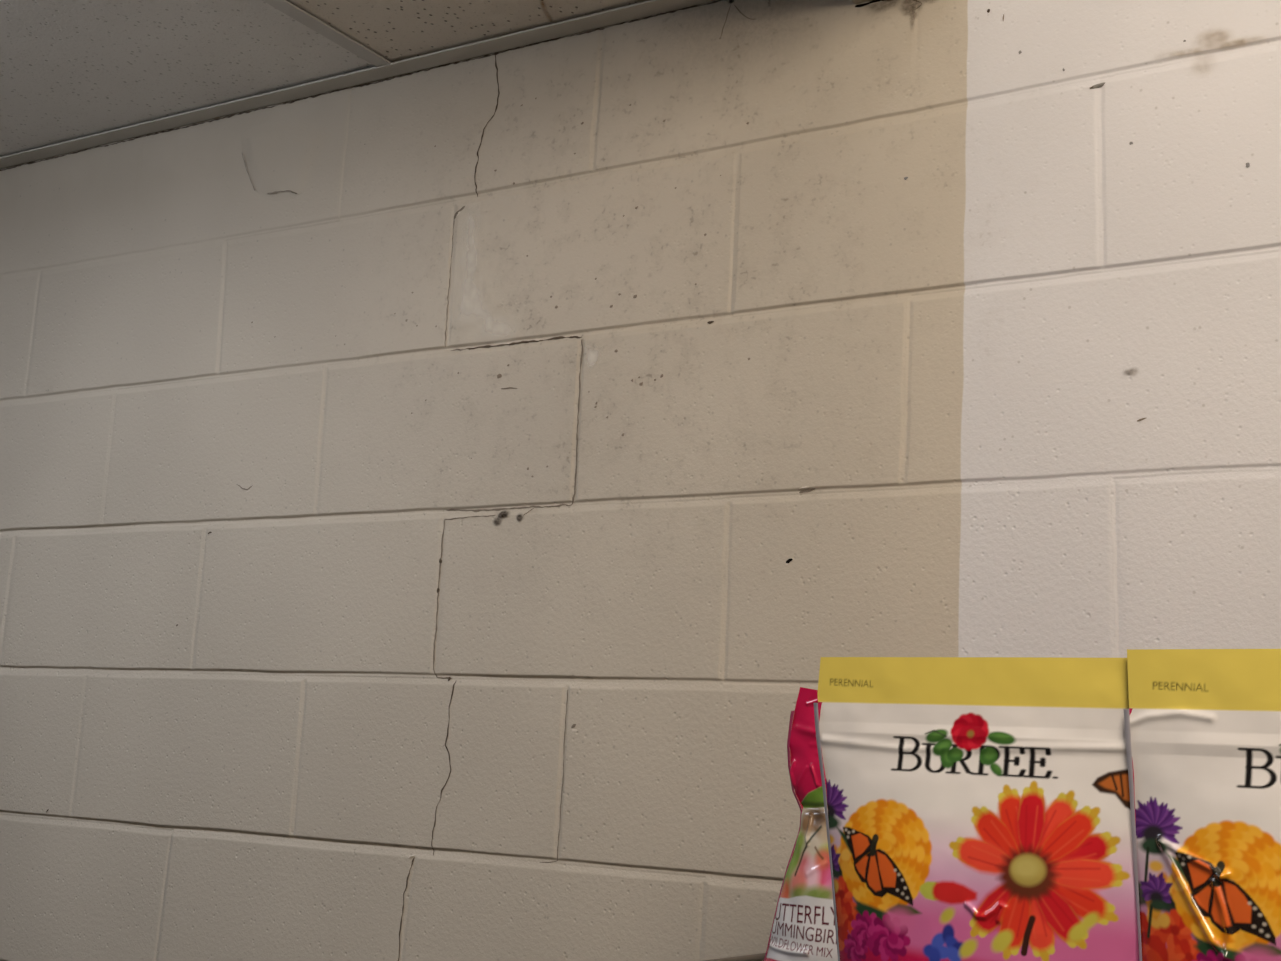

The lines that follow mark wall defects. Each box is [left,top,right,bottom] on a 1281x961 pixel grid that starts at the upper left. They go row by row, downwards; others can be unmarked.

crack [0,0,721,197]
crack [398,336,583,961]